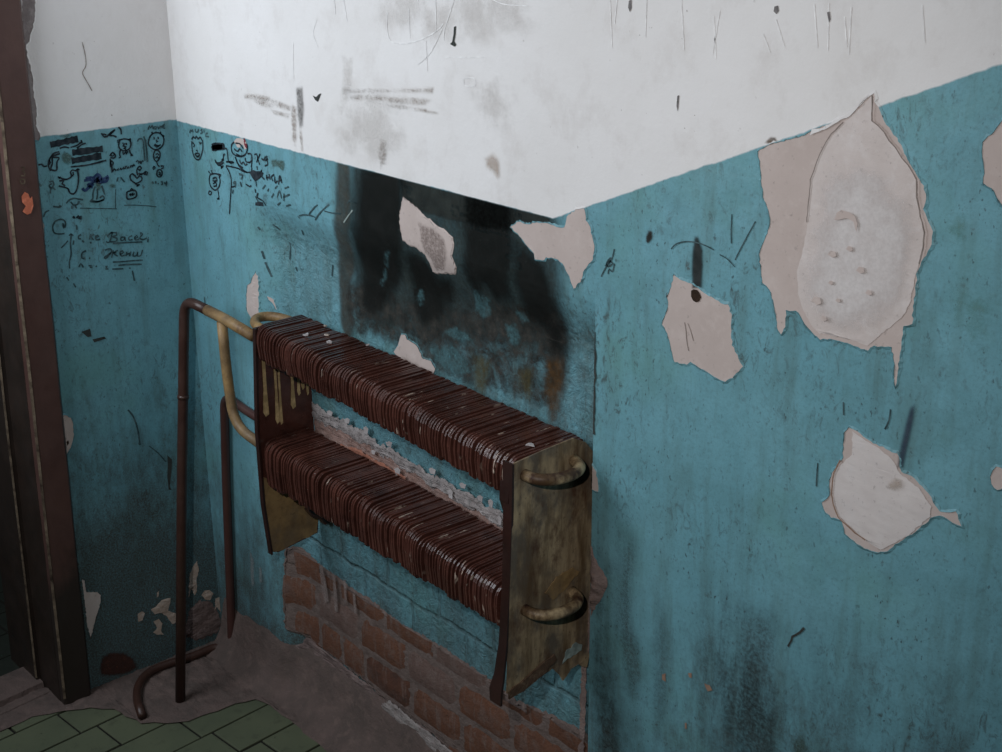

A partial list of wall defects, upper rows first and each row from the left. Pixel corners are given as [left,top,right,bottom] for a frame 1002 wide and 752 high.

peeling [979,118,1002,208]
peeling [399,196,457,275]
peeling [510,206,597,290]
peeling [756,90,936,389]
peeling [394,333,437,374]
peeling [660,272,745,384]
peeling [820,425,964,554]
peeling [989,464,1002,491]
peeling [138,562,221,641]
spalling [282,546,588,752]